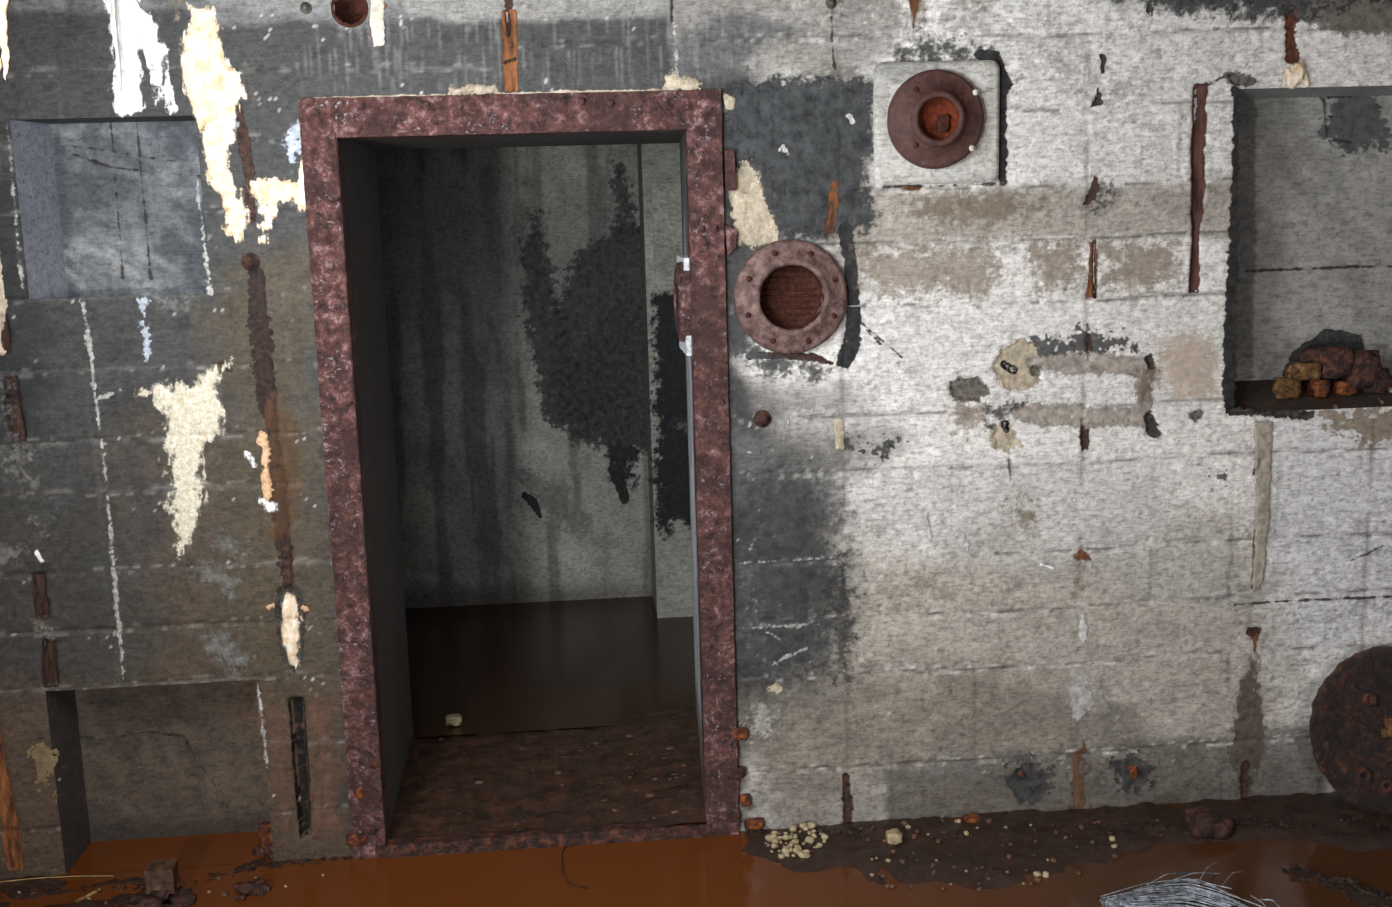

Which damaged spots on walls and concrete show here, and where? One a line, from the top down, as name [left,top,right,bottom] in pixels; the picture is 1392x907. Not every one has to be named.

corrosion [1283,5,1309,89]
damp [103,0,306,244]
damp [825,552,860,684]
corrosion [733,726,748,740]
corrosion [725,765,764,830]